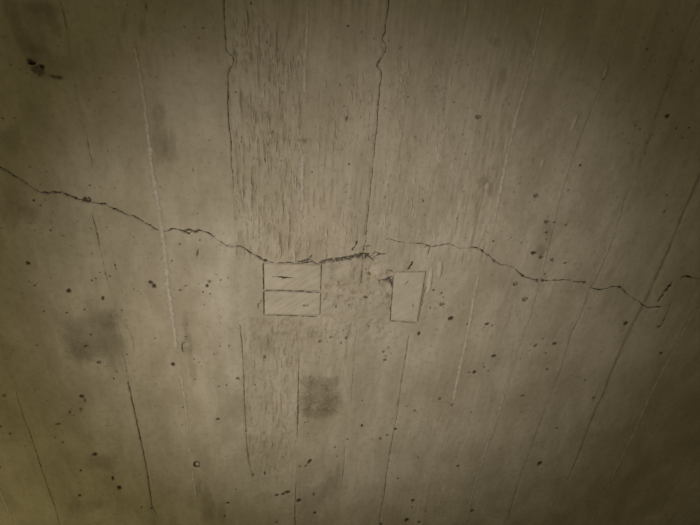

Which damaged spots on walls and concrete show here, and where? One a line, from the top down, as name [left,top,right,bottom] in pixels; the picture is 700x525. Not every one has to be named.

crack [37,0,399,264]
crack [416,243,698,324]